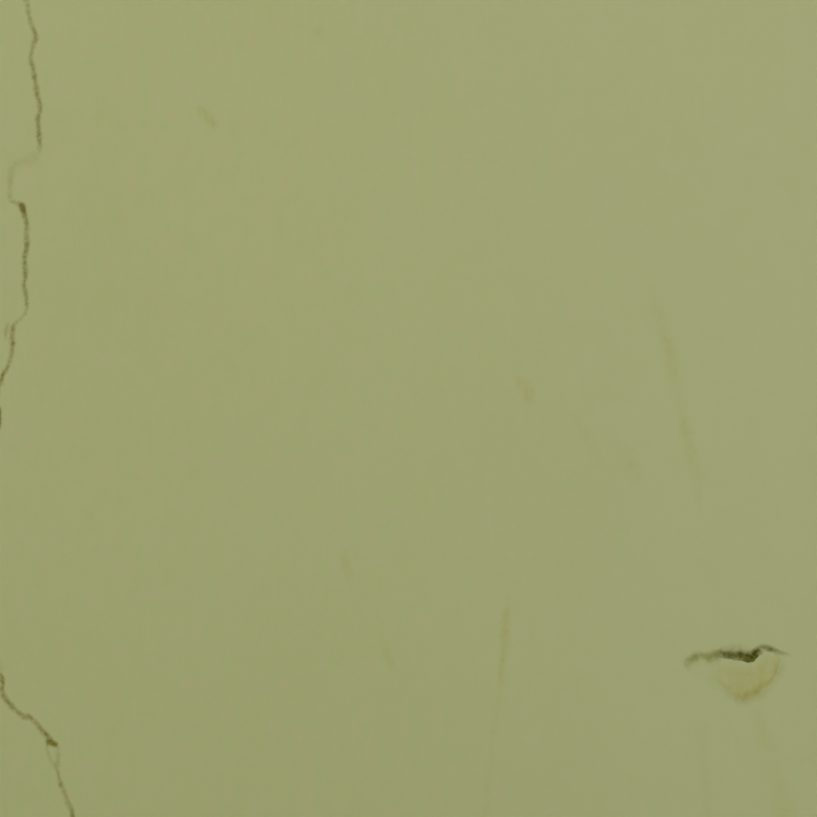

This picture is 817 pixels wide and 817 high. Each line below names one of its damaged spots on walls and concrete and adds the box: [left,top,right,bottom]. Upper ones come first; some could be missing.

peeling [706,649,781,701]